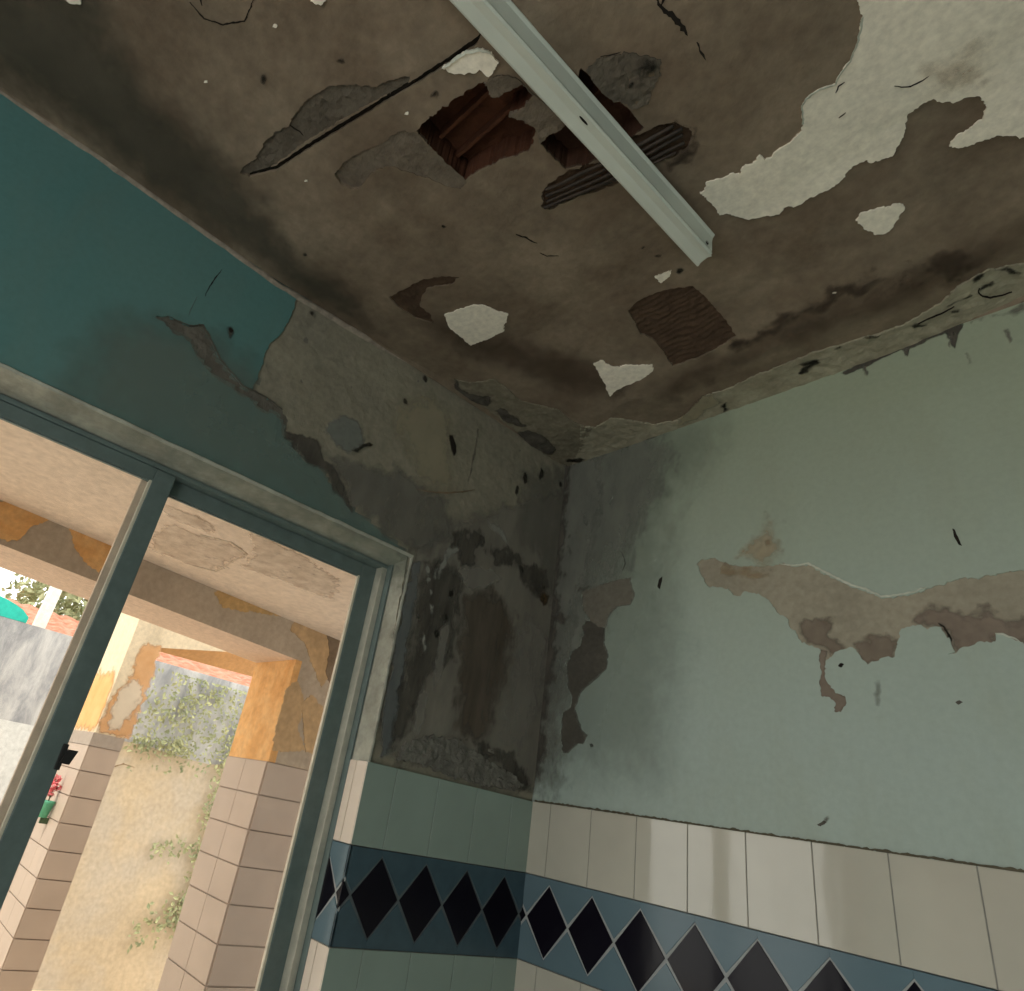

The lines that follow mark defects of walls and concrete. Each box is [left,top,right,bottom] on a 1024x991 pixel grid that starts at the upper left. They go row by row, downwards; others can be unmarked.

spalling [241,76,410,175]
crack [250,34,481,175]
spalling [417,48,617,209]
spalling [578,51,695,168]
peeling [700,0,1024,220]
peeling [856,203,905,235]
peeling [152,263,1024,801]
water stain [391,439,663,789]